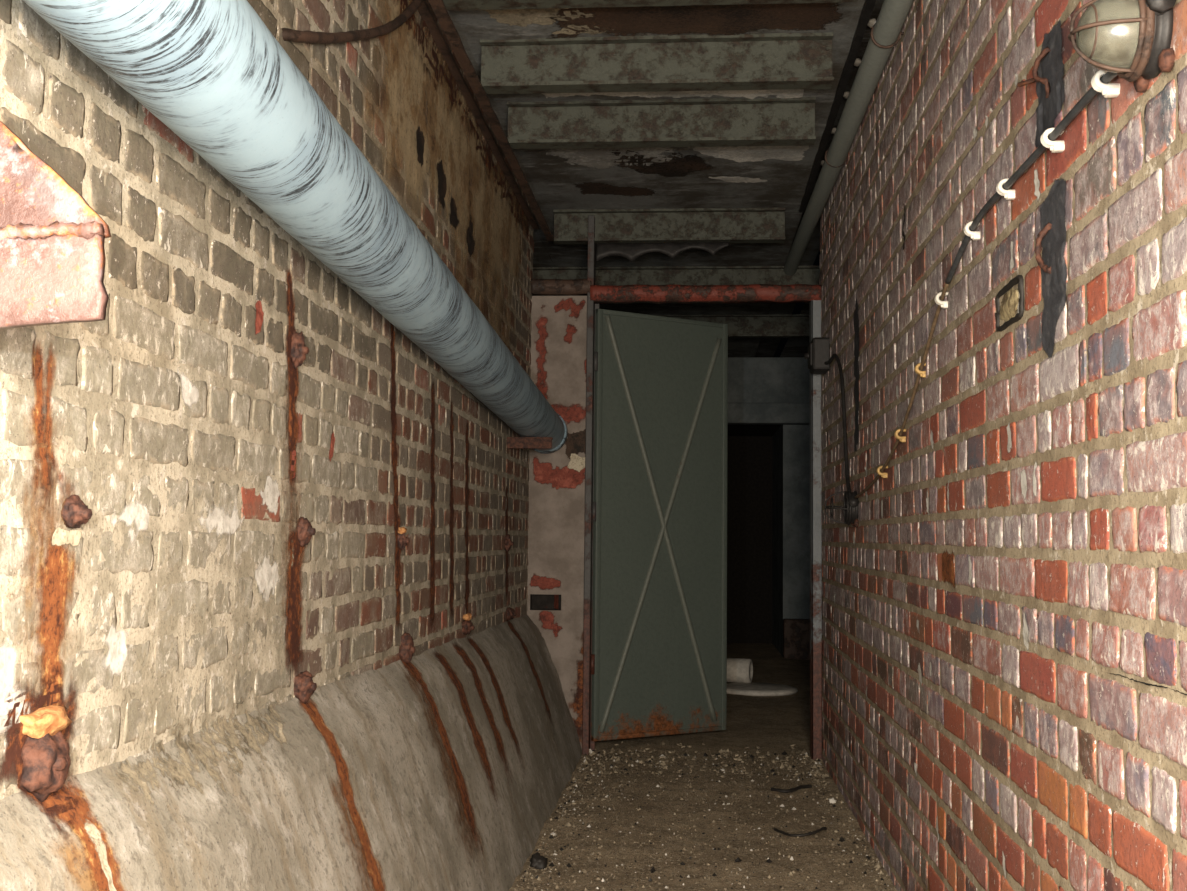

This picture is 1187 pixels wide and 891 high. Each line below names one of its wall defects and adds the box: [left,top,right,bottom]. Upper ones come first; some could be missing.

rust [0,345,124,891]
rust [286,270,306,674]
rust [299,700,385,891]
rust [390,324,401,626]
rust [401,659,481,849]
rust [449,402,470,616]
rust [434,638,520,794]
peeling [530,574,561,590]
peeling [539,611,563,637]
peeling [533,298,586,489]
crack [1110,673,1187,695]